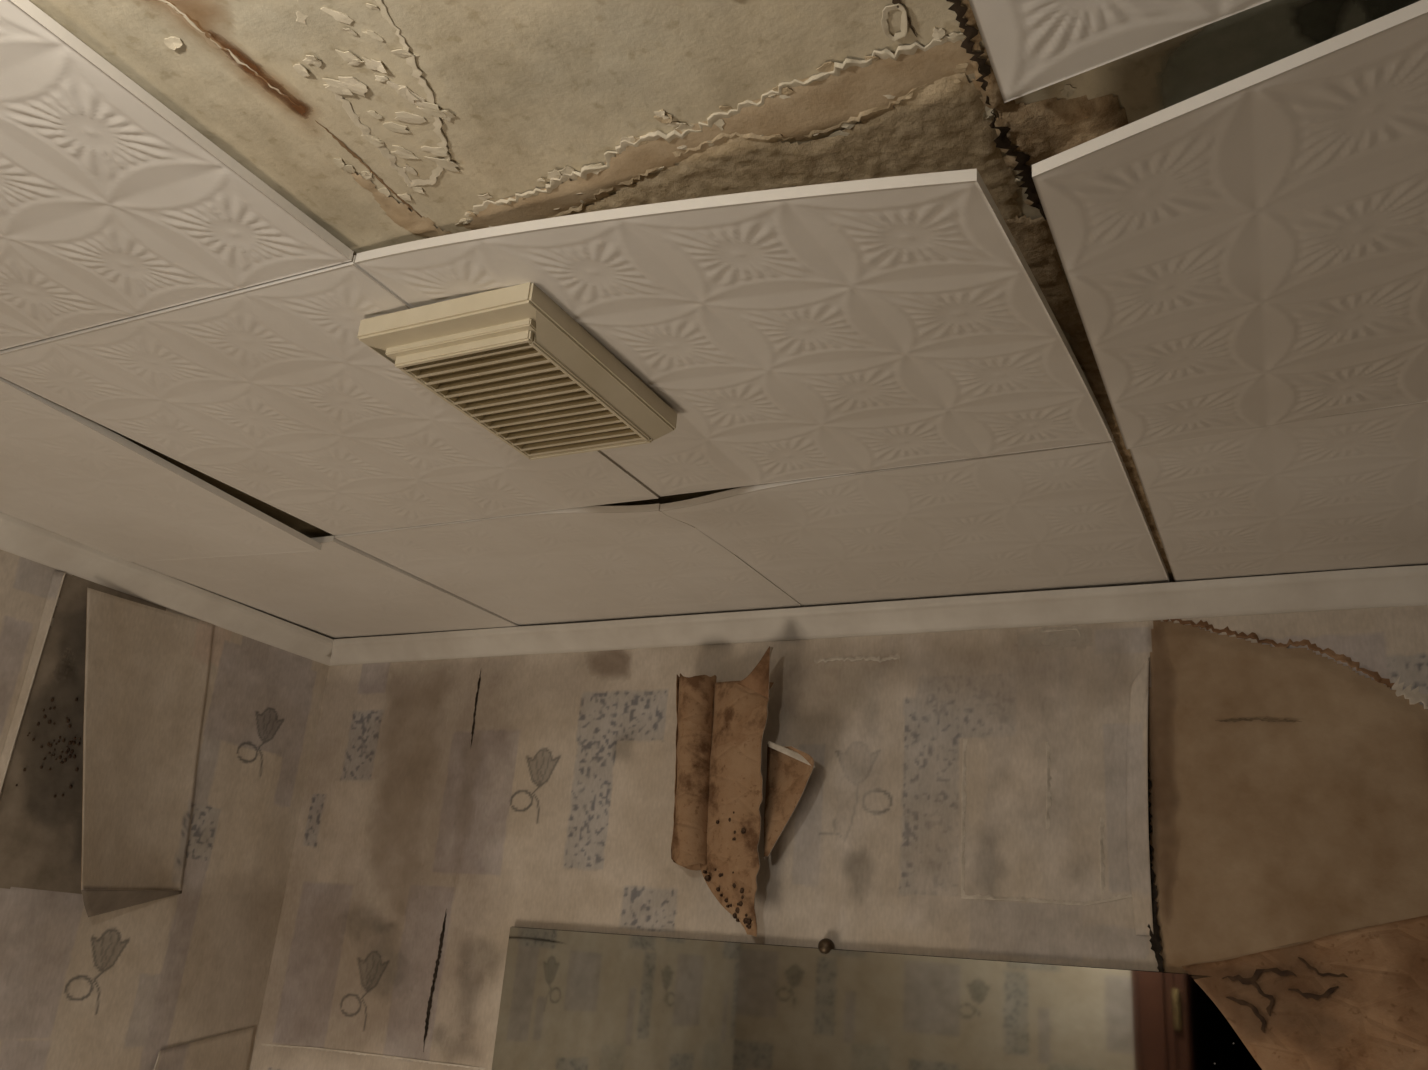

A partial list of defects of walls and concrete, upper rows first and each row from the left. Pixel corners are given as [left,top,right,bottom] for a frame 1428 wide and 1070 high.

crack [892,0,917,37]
peeling [164,36,183,50]
spalling [293,0,1175,582]